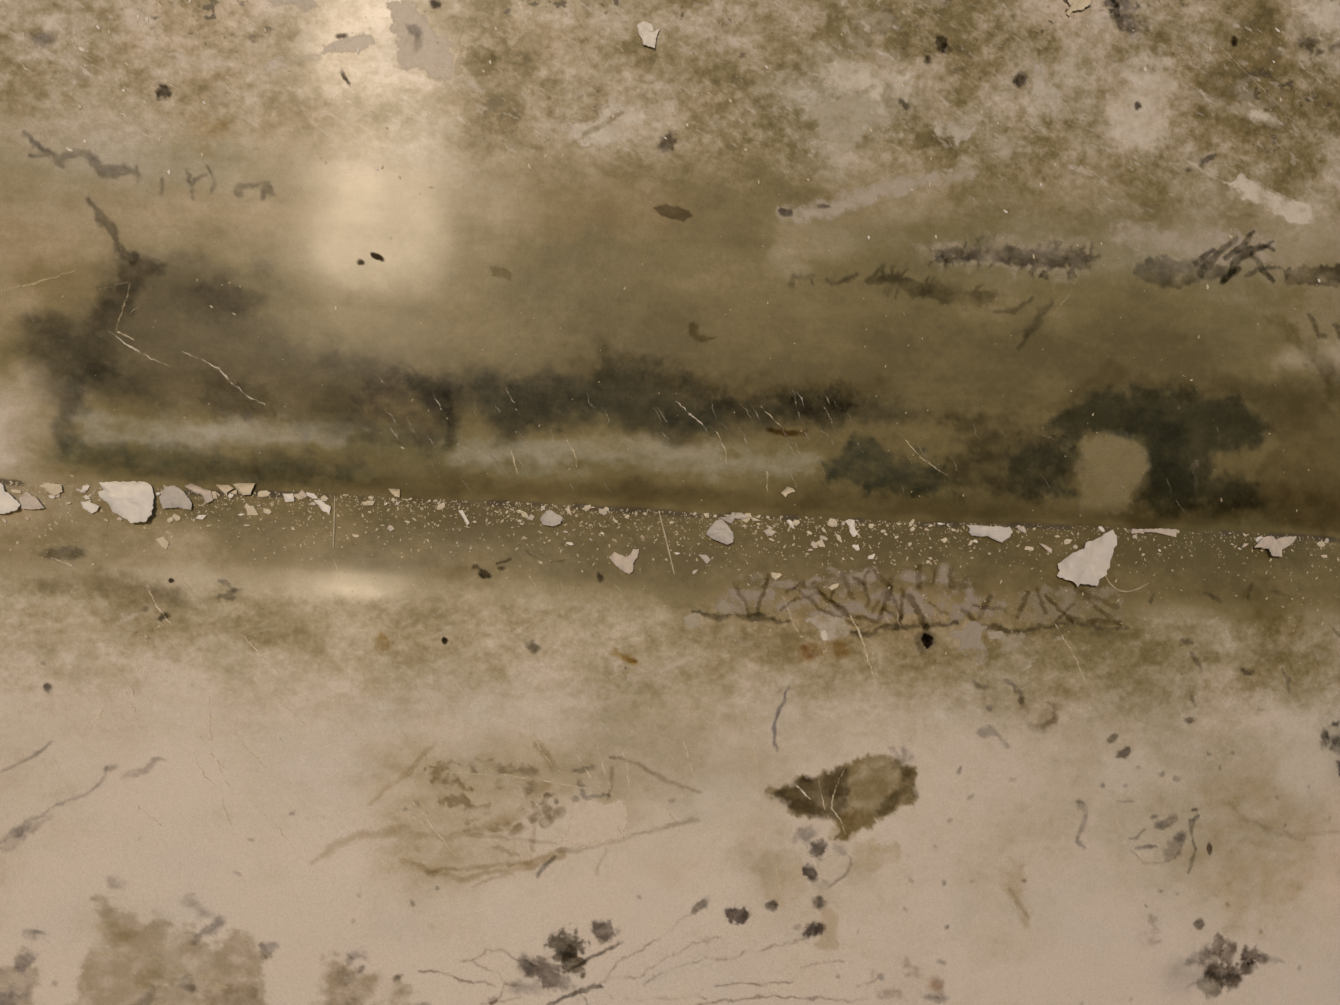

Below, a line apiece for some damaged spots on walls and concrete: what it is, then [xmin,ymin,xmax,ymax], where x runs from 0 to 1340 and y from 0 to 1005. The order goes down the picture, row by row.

peeling [0,481,345,550]
peeling [362,489,445,531]
peeling [494,503,647,545]
peeling [609,549,639,574]
peeling [1033,526,1179,622]
peeling [1230,533,1296,562]
leakage [551,932,585,977]
leakage [1208,948,1255,985]